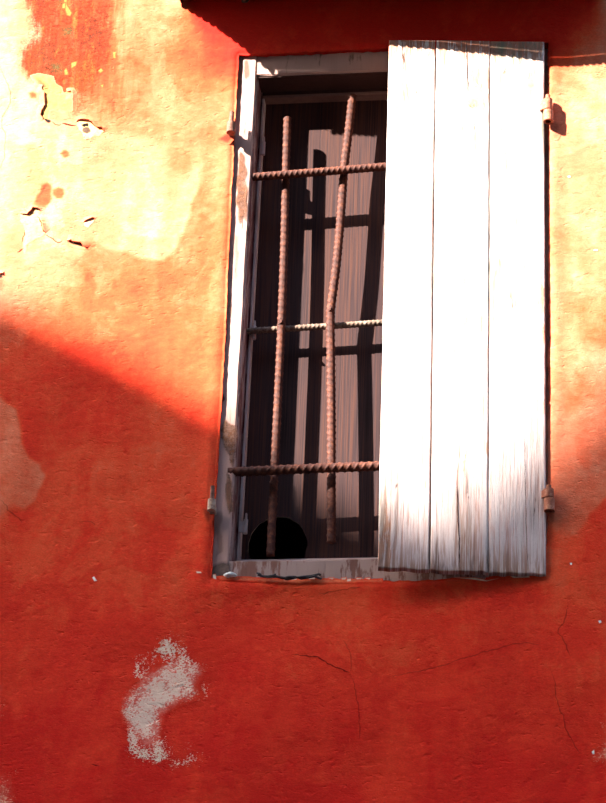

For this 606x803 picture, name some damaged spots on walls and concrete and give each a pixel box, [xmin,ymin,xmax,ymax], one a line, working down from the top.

flaking render [30,67,108,140]
flaking render [18,202,98,254]
crack [292,654,347,672]
damp [345,493,606,768]